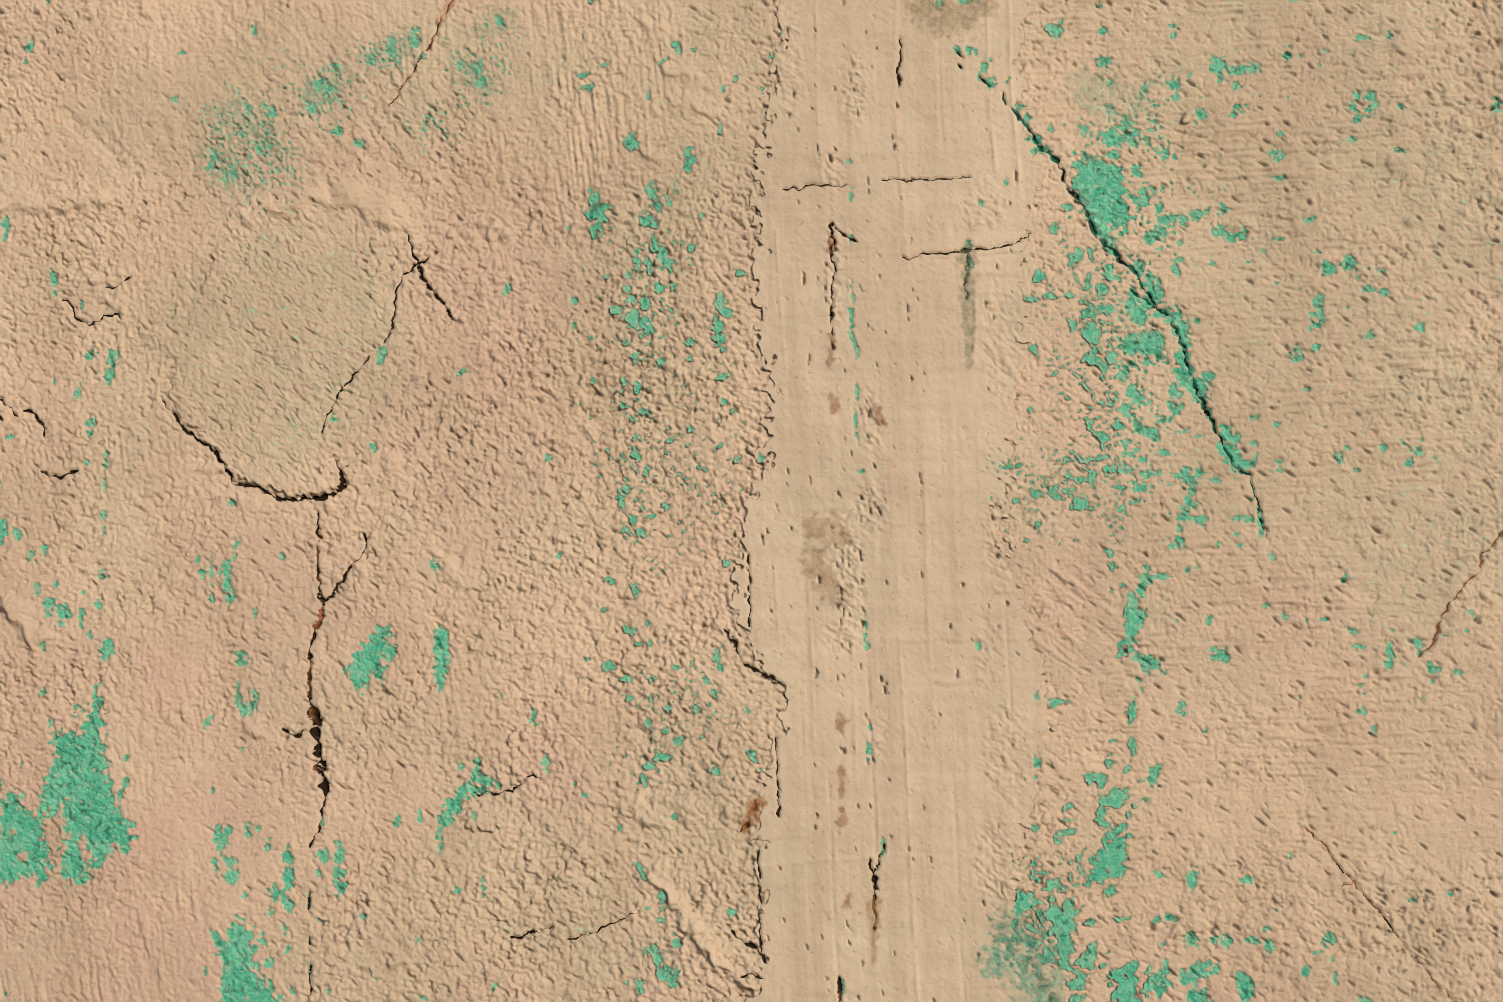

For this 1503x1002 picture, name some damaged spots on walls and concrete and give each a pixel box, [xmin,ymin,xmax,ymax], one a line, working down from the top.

peeling [953,45,1011,89]
crack [955,50,1267,538]
peeling [1288,250,1391,364]
peeling [0,482,49,564]
crack [162,234,452,848]
peeling [986,48,1286,1002]
peeling [33,580,116,662]
peeling [1383,629,1469,698]
peeling [0,680,140,889]
peeling [203,818,348,1002]
crack [306,892,314,996]
peeling [1301,932,1341,986]